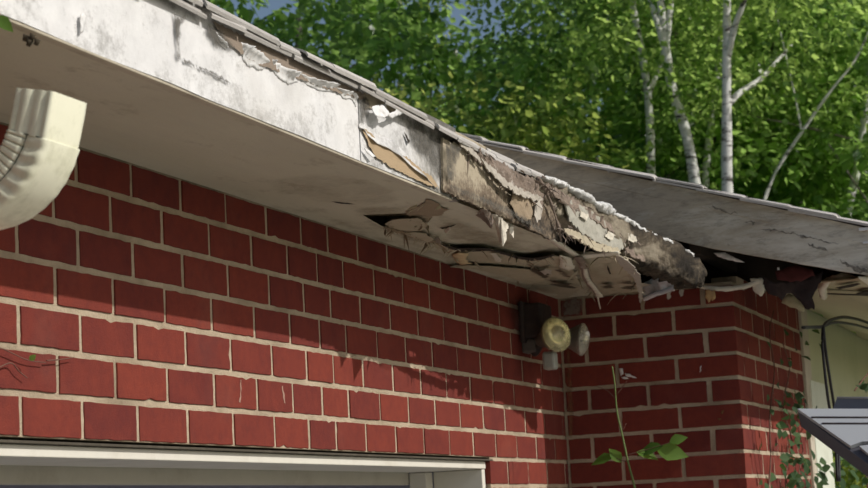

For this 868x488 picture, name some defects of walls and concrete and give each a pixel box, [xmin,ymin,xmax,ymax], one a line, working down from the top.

water stain [170,3,186,59]
water stain [208,27,233,49]
peeling [213,21,404,118]
peeling [358,123,439,189]
water stain [410,125,542,231]
peeling [405,199,449,245]
peeling [476,209,514,245]
peeling [534,200,543,223]
crack [709,206,868,296]
peeling [573,256,603,309]